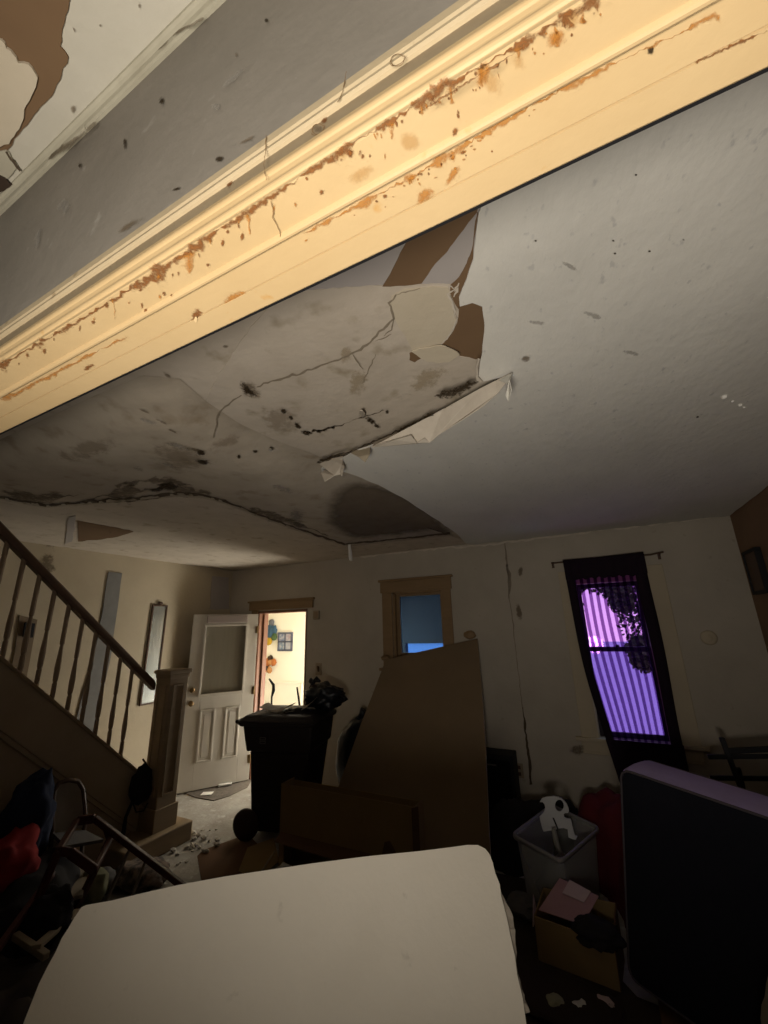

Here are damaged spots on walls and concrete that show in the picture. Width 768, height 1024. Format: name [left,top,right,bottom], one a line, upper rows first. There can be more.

rust [696,33,761,64]
rust [0,0,720,369]
rust [1,340,120,400]
crack [213,288,420,438]
peeling [206,208,480,448]
water stain [281,381,478,464]
crack [504,543,532,785]